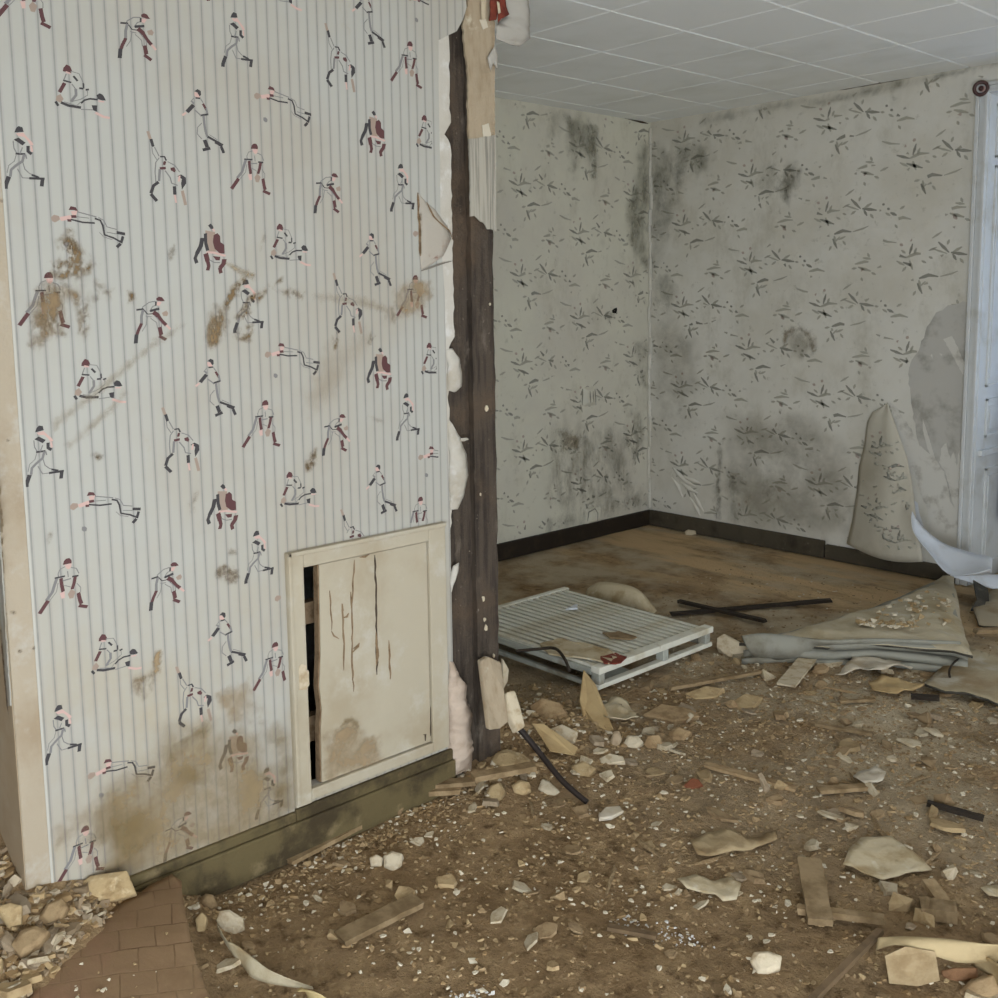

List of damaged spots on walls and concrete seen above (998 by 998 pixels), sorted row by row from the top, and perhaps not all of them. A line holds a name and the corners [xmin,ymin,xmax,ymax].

peeling [480,0,509,30]
mould [631,173,661,265]
leakage [36,239,91,338]
peeling [890,301,967,548]
leakage [102,735,265,868]